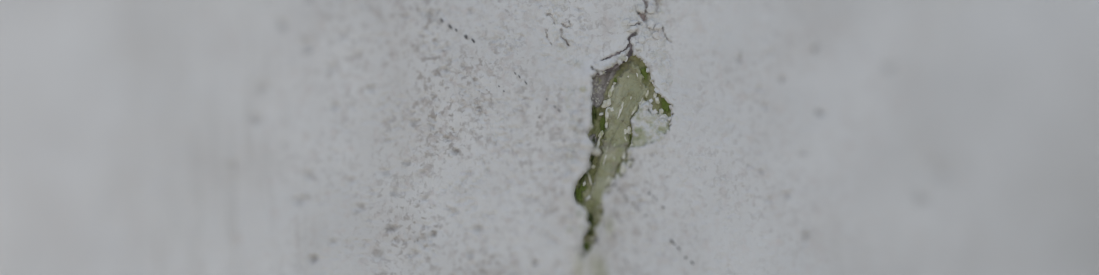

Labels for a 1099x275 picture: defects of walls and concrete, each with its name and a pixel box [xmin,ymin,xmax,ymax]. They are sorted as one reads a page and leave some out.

peeling [562,52,674,257]